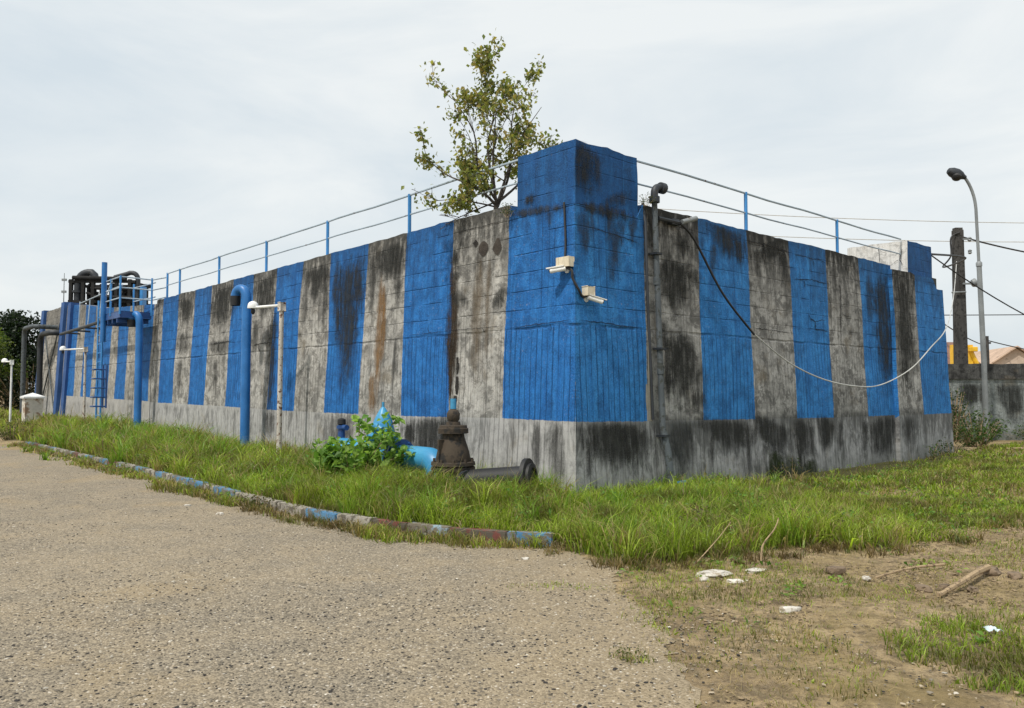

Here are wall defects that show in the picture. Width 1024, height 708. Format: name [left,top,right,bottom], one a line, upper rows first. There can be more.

leakage [305,244,404,376]
rust [368,287,386,408]
leakage [445,253,504,396]
leakage [660,241,698,306]
leakage [662,324,703,407]
crack [749,241,850,332]
leakage [866,279,915,388]
leakage [582,422,647,466]
leakage [671,415,843,476]
leakage [864,418,914,453]